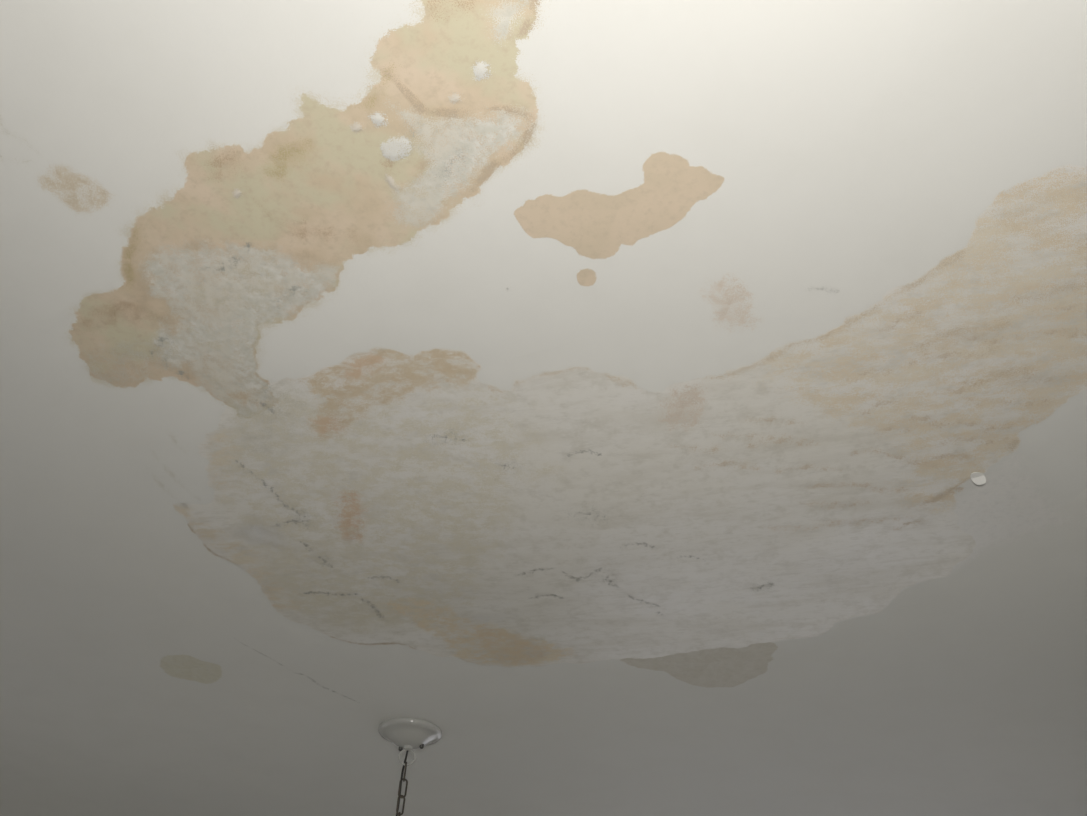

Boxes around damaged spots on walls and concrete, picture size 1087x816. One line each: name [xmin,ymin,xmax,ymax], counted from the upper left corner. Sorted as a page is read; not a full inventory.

peeling [62,0,1087,668]